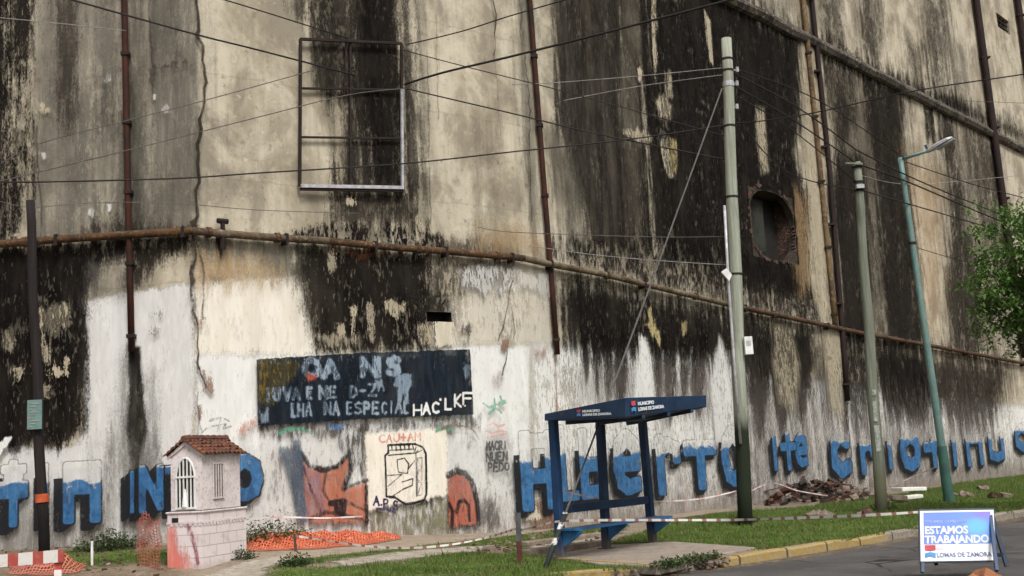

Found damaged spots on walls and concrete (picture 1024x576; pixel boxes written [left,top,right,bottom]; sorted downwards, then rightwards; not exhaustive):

damp [0,0,245,454]
crack [189,0,208,388]
damp [258,0,514,355]
damp [551,0,1024,509]